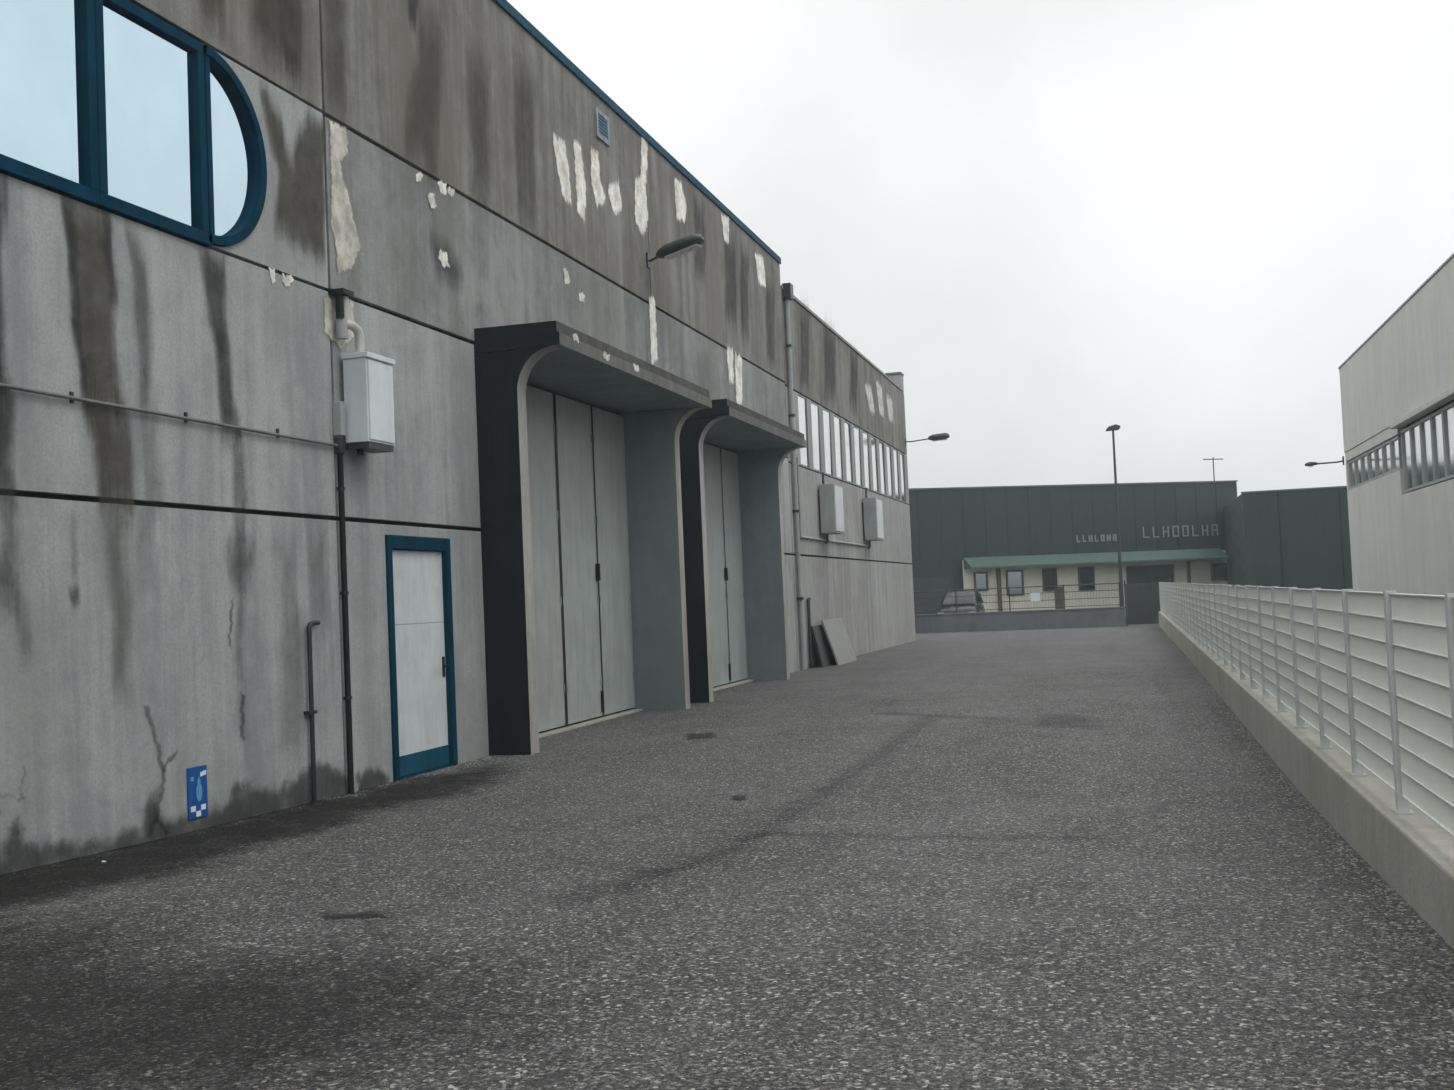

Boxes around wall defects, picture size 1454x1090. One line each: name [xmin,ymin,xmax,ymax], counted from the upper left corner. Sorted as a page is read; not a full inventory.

damp [256,0,301,66]
damp [0,304,12,482]
damp [65,208,132,507]
damp [204,252,236,426]
damp [262,93,324,254]
peeling [324,296,354,349]
peeling [329,120,361,273]
peeling [416,172,455,208]
spalling [438,249,450,268]